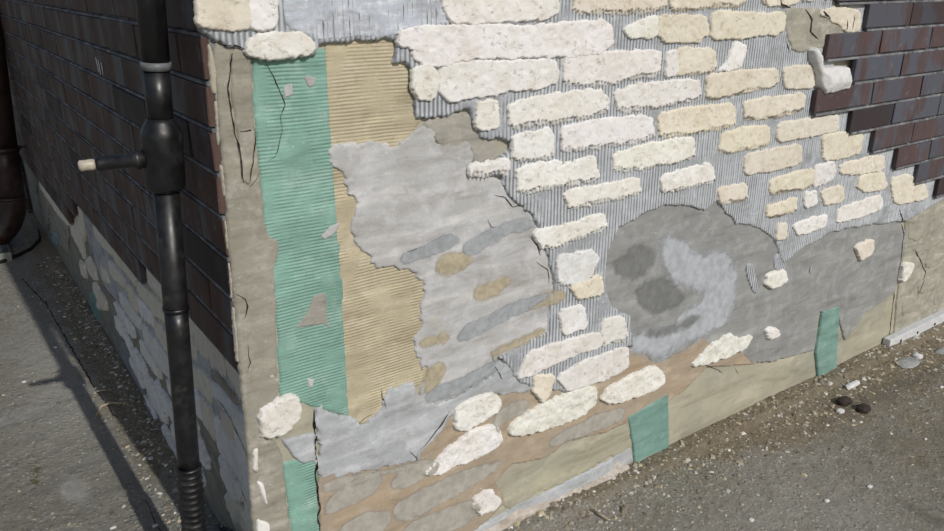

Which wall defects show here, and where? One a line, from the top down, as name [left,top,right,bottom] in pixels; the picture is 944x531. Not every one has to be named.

crack [210,41,285,182]
spalling [83,213,170,380]
spalling [189,0,944,531]
crack [313,411,321,530]